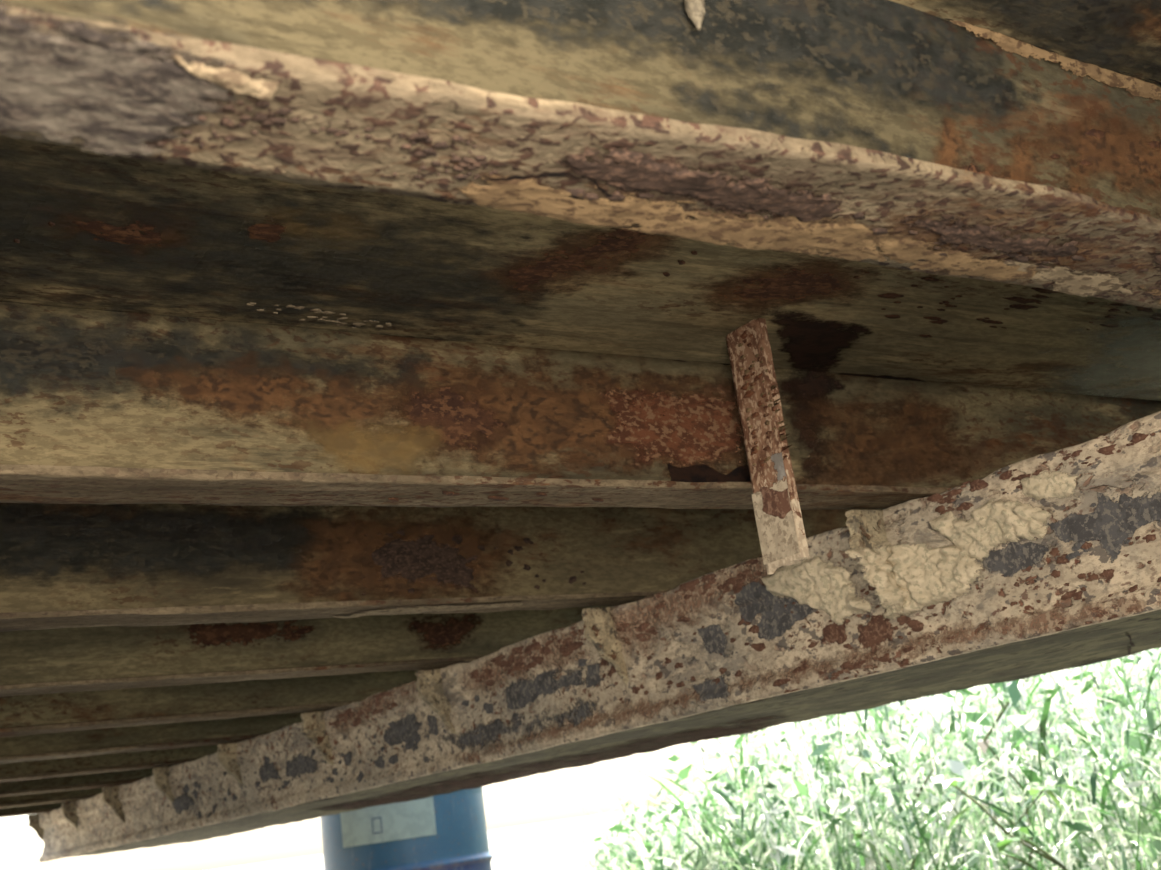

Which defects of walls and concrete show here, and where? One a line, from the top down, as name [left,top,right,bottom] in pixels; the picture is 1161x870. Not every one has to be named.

corrosion [555,147,865,223]
corrosion [935,119,1036,184]
corrosion [479,228,697,304]
peeling [456,172,1161,305]
corrosion [116,258,1161,519]
corrosion [365,530,546,595]
corrosion [1123,529,1156,557]
corrosion [184,620,316,648]
corrosion [311,547,1161,811]
peeling [254,659,601,791]
peeling [167,772,242,821]